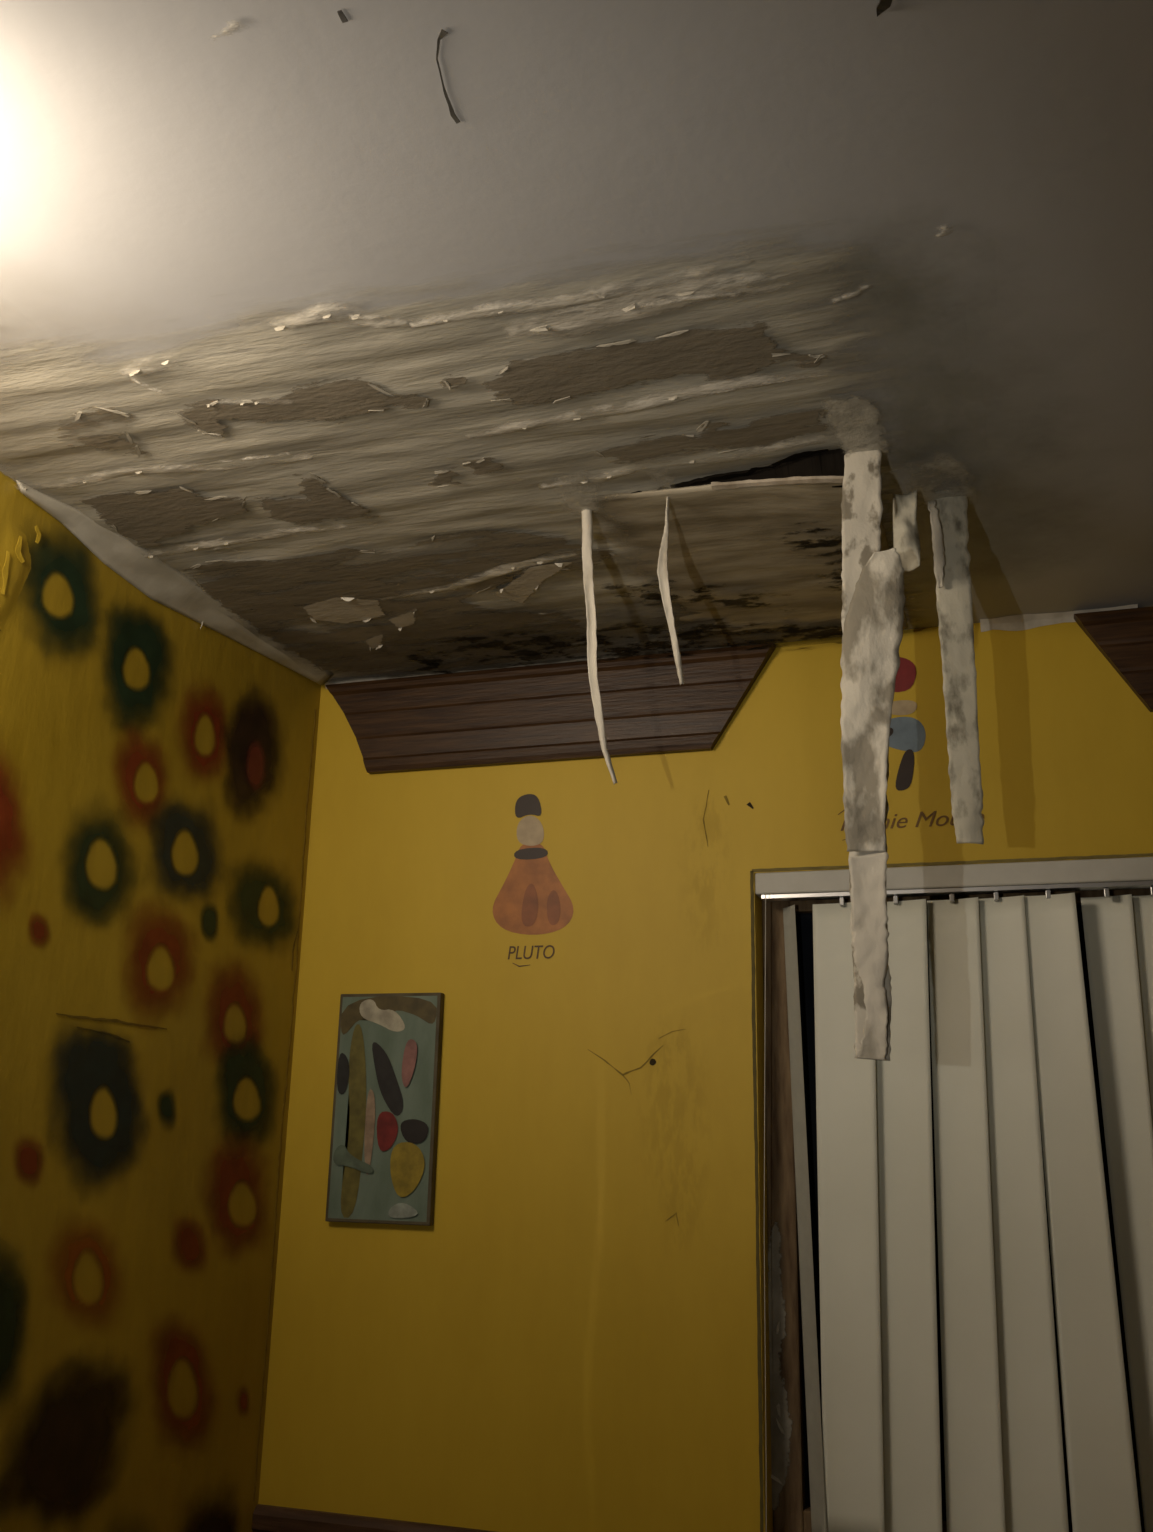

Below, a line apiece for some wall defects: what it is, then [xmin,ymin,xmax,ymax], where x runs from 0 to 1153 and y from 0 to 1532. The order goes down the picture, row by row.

flaking render [0,242,875,681]
damp [787,523,842,590]
damp [408,580,843,674]